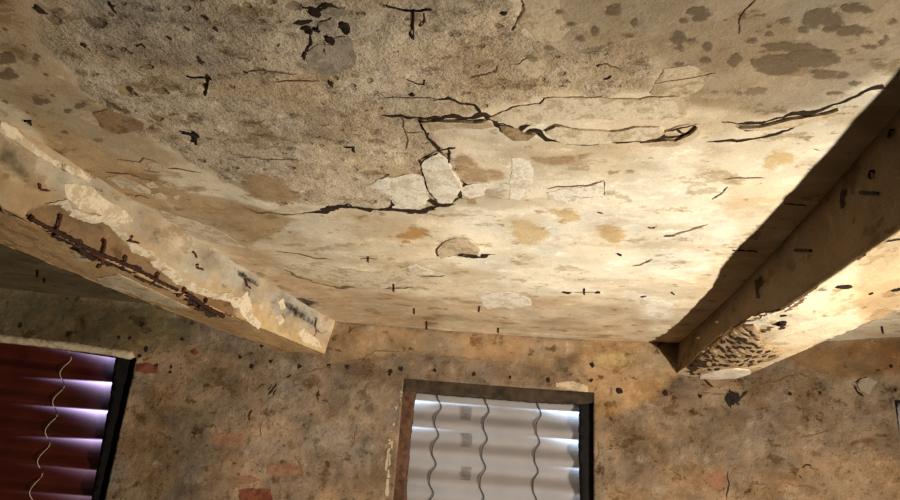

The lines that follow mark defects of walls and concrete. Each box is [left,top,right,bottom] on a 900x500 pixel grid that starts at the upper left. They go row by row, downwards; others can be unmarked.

peeling [65,103,144,142]
crack [236,154,299,162]
crack [246,64,885,216]
peeling [368,153,488,209]
peeling [0,121,264,330]
spalling [437,237,493,259]
peeling [275,298,286,326]
peeling [298,328,322,348]
spalling [686,286,818,380]